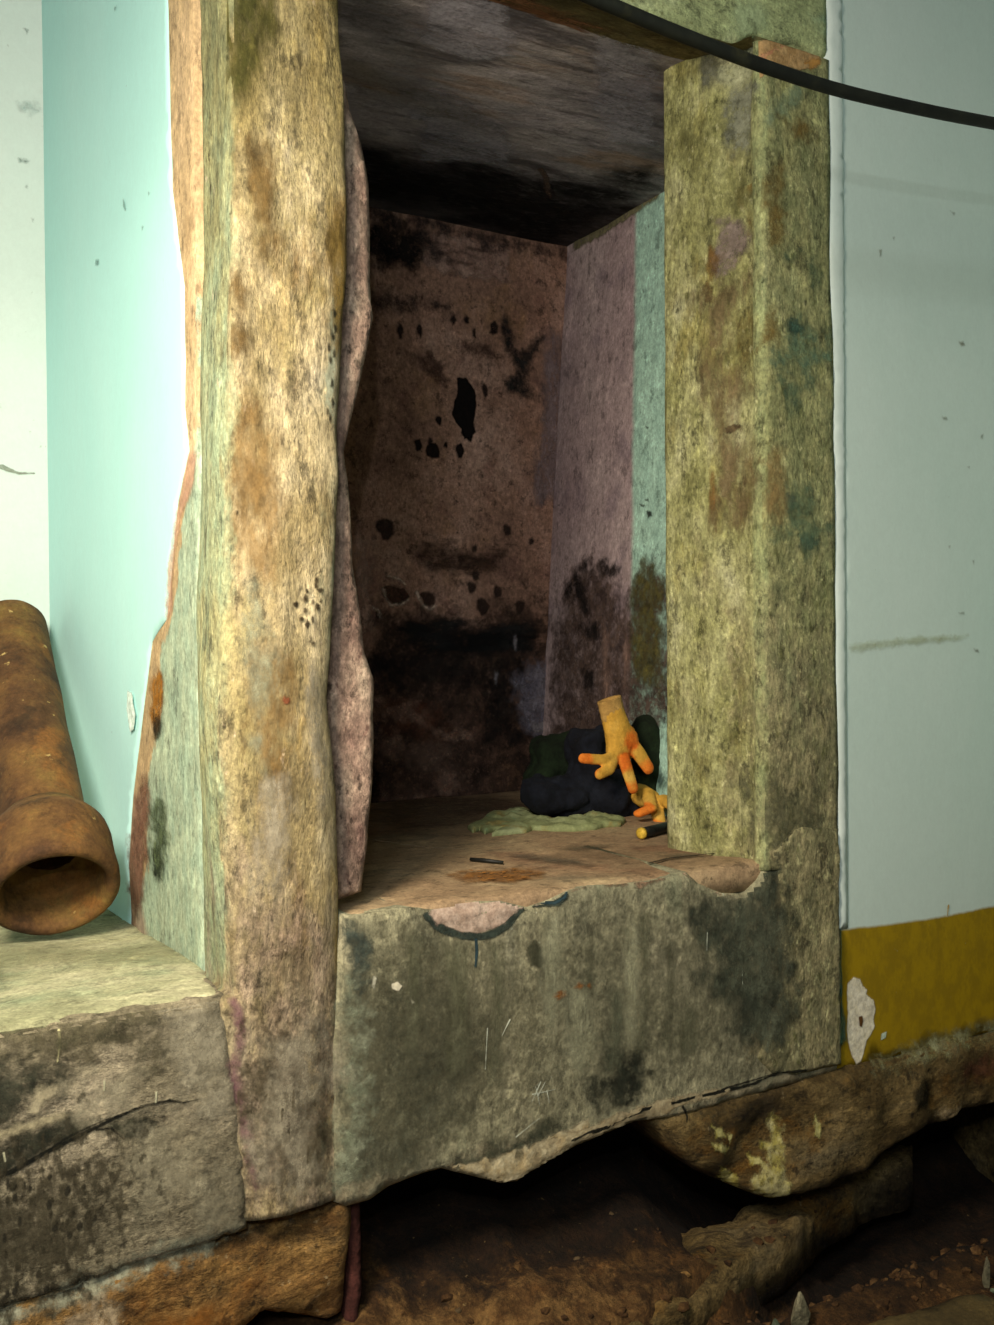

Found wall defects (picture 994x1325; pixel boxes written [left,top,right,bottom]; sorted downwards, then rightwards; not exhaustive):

water stain [534,334,561,504]
water stain [604,558,664,698]
water stain [688,777,822,1052]
peeling [847,978,887,1064]
crack [0,1099,195,1177]
water stain [0,1001,322,1188]
water stain [712,1115,790,1198]